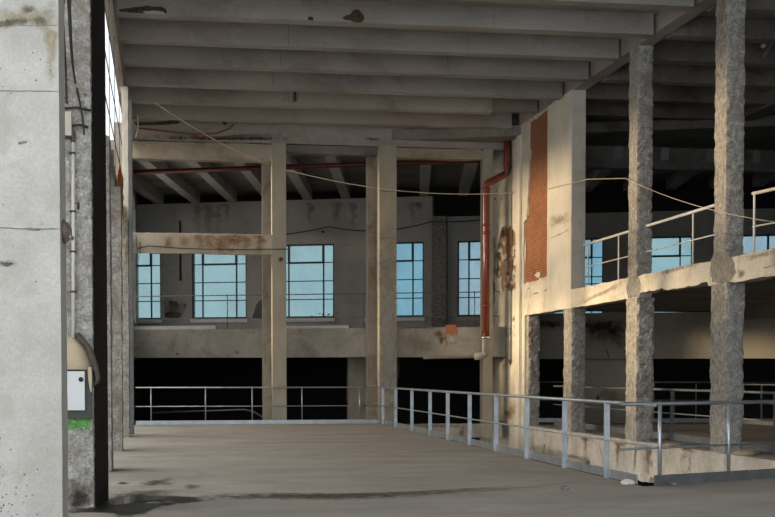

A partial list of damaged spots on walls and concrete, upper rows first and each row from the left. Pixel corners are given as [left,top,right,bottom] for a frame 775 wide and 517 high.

damp [0,7,56,59]
spalling [119,6,167,14]
spalling [342,9,364,23]
flaking render [492,98,548,291]